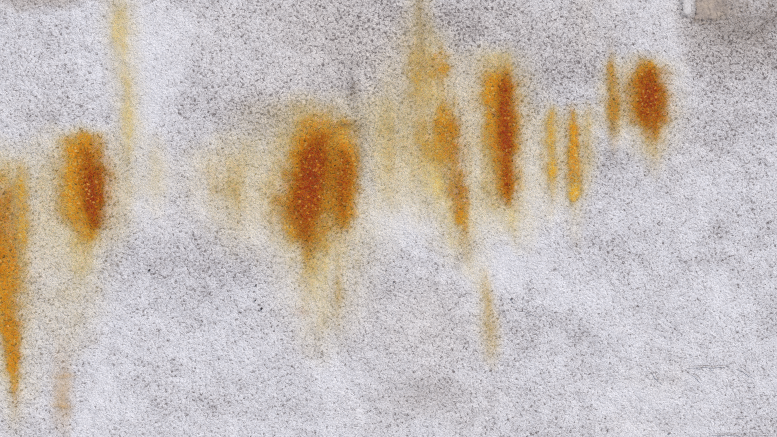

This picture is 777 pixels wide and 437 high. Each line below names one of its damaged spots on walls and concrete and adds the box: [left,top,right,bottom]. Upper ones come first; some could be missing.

corrosion [0,162,30,400]
corrosion [54,130,116,274]
corrosion [262,106,361,303]
corrosion [407,42,474,247]
corrosion [477,55,523,232]
corrosion [543,107,586,203]
corrosion [605,59,670,147]